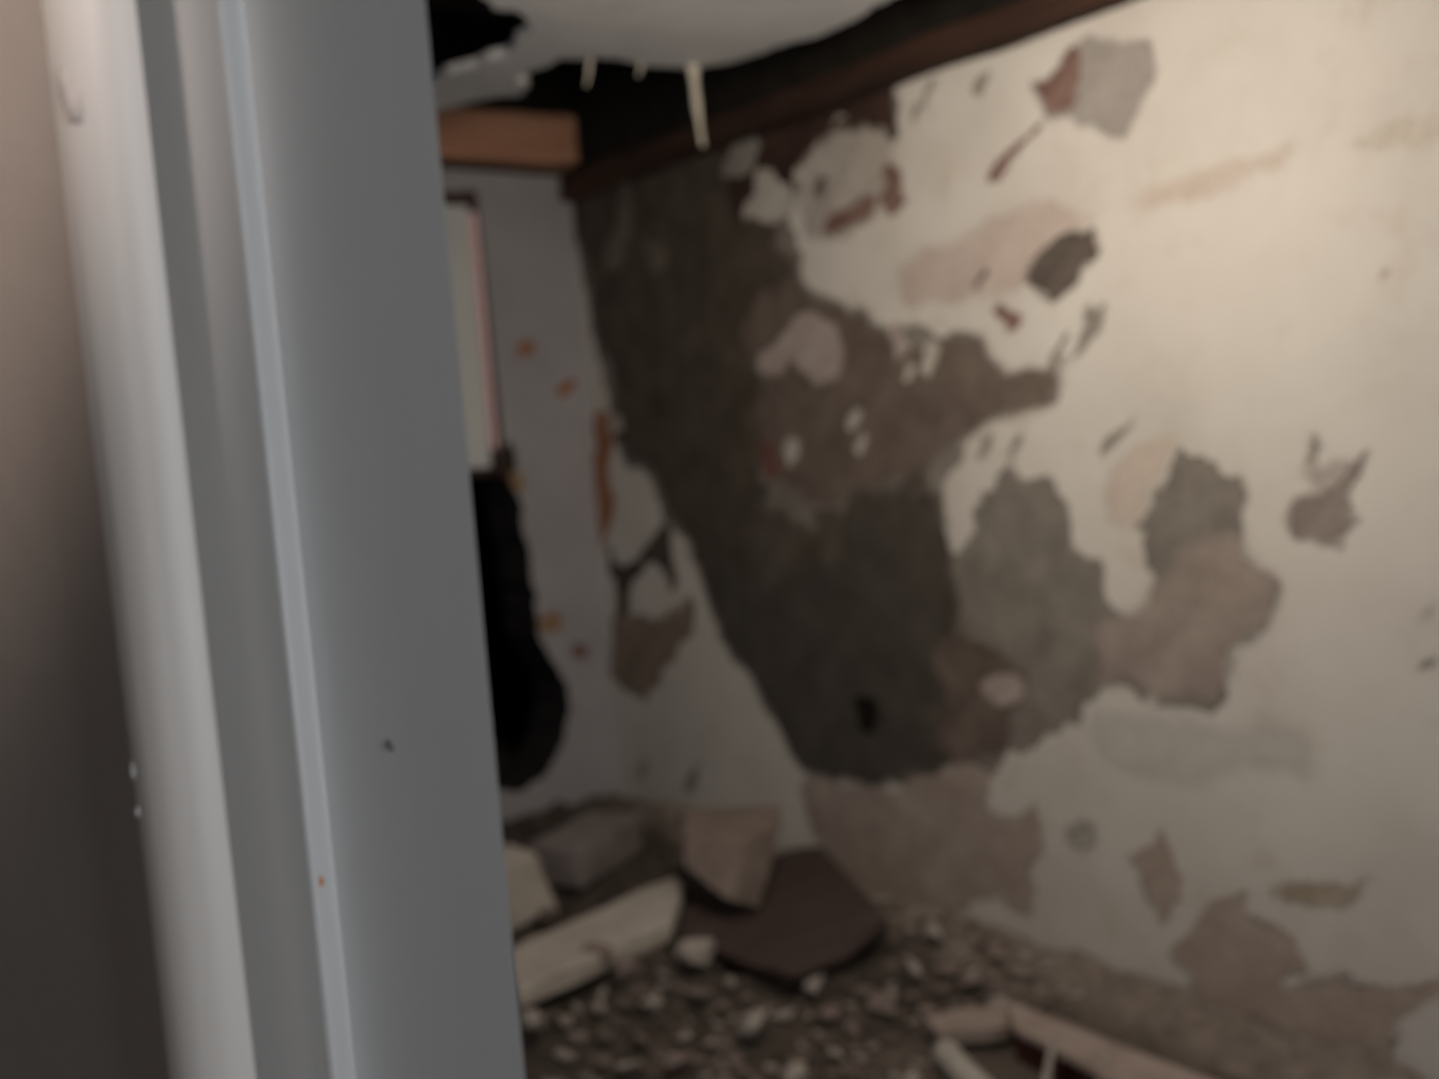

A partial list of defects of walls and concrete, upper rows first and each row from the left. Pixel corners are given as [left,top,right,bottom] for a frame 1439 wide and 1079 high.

peeling [1028,32,1157,140]
flaking render [572,86,1291,789]
peeling [1282,430,1370,550]